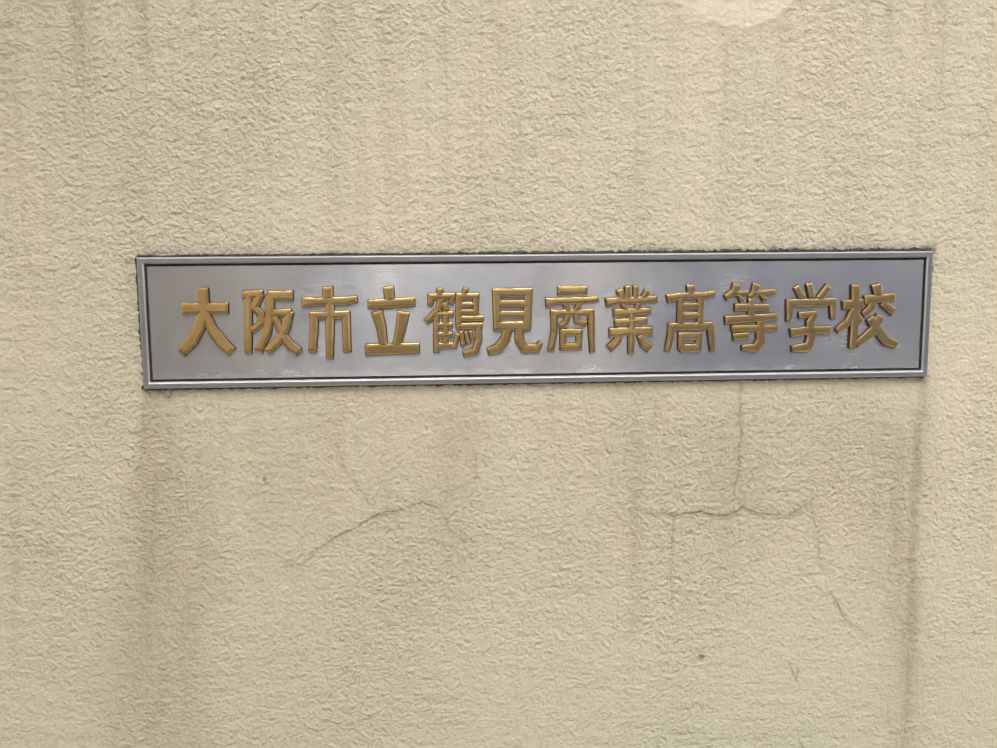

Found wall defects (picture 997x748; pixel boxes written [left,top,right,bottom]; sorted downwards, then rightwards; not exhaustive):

crack [651,388,819,565]